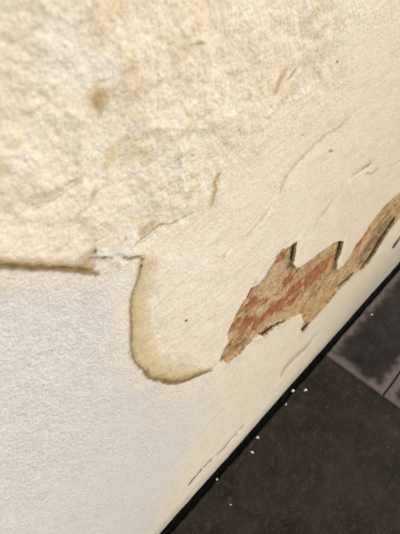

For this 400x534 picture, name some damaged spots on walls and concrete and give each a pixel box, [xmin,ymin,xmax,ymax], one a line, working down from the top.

water stain [0,259,100,276]
crack [130,274,211,385]
spalling [212,193,400,370]